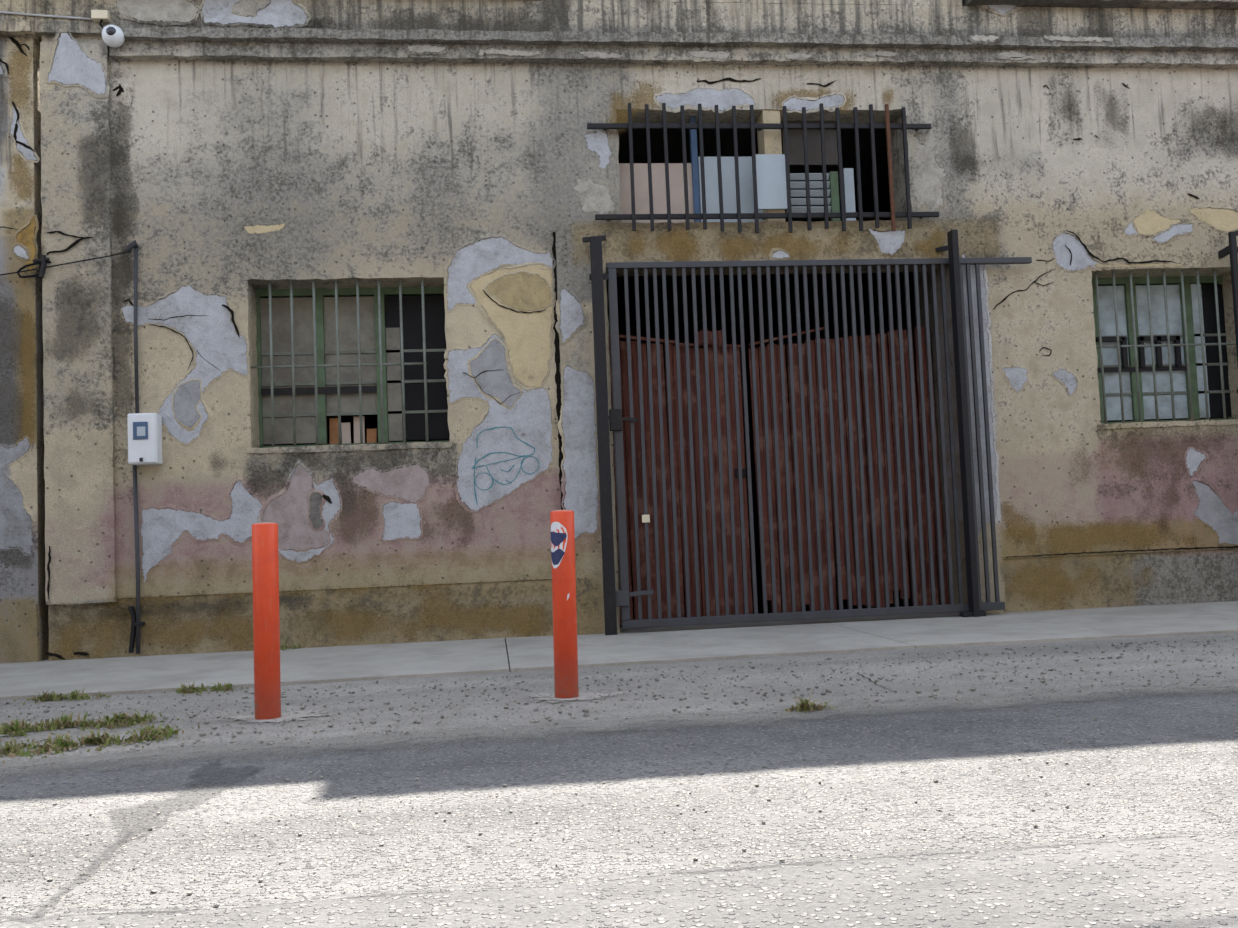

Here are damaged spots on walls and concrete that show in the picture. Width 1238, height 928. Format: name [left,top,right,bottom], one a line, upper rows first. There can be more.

peeling [114,0,312,29]
peeling [46,31,110,98]
peeling [653,86,758,113]
peeling [781,92,847,114]
peeling [8,106,40,163]
water stain [78,106,136,413]
peeling [1049,230,1185,273]
peeling [1120,205,1238,245]
peeling [120,283,250,446]
peeling [443,233,601,542]
peeling [139,459,433,584]